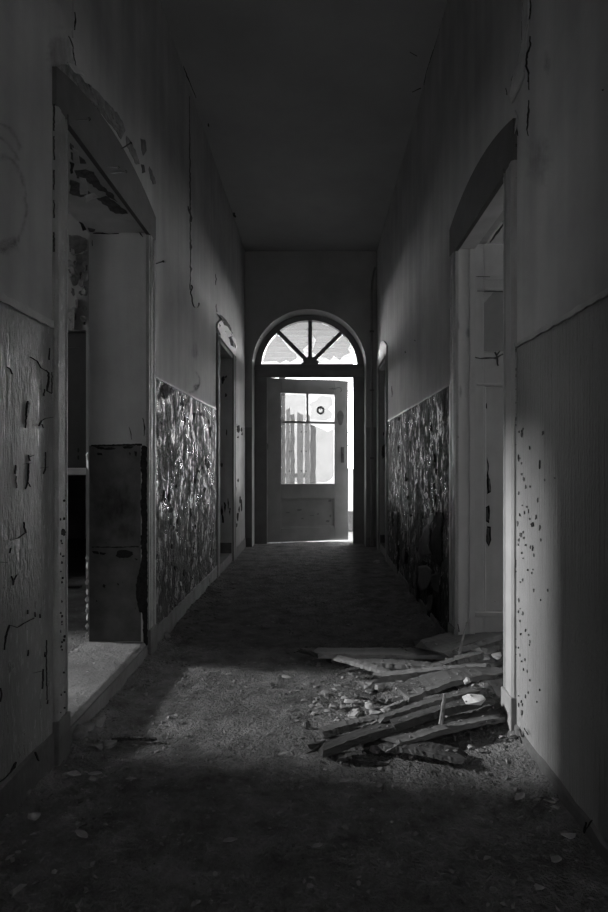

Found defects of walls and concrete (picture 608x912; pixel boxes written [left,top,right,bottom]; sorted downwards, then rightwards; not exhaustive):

spalling [69,143,128,214]
spalling [57,62,156,184]
crack [183,66,209,290]
crack [516,0,531,147]
peeling [217,314,237,349]
peeling [191,456,223,492]
peeling [382,417,444,622]
peeling [517,498,542,559]
peeling [518,598,541,715]